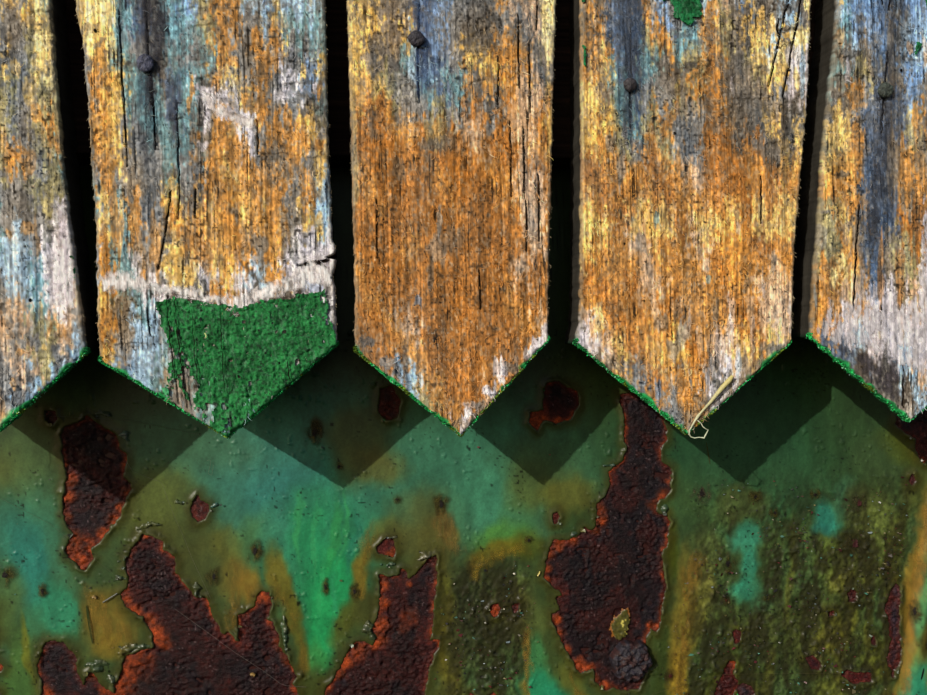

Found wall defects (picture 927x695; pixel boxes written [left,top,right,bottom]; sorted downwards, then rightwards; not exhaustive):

crack [768,0,801,96]
corrosion [529,381,579,430]
corrosion [895,408,927,463]
corrosion [61,416,132,570]
corrosion [377,538,396,558]
corrosion [544,393,672,690]
corrosion [38,534,297,695]
corrosion [325,556,440,695]
corrosion [714,661,754,695]
corrosion [884,584,922,677]